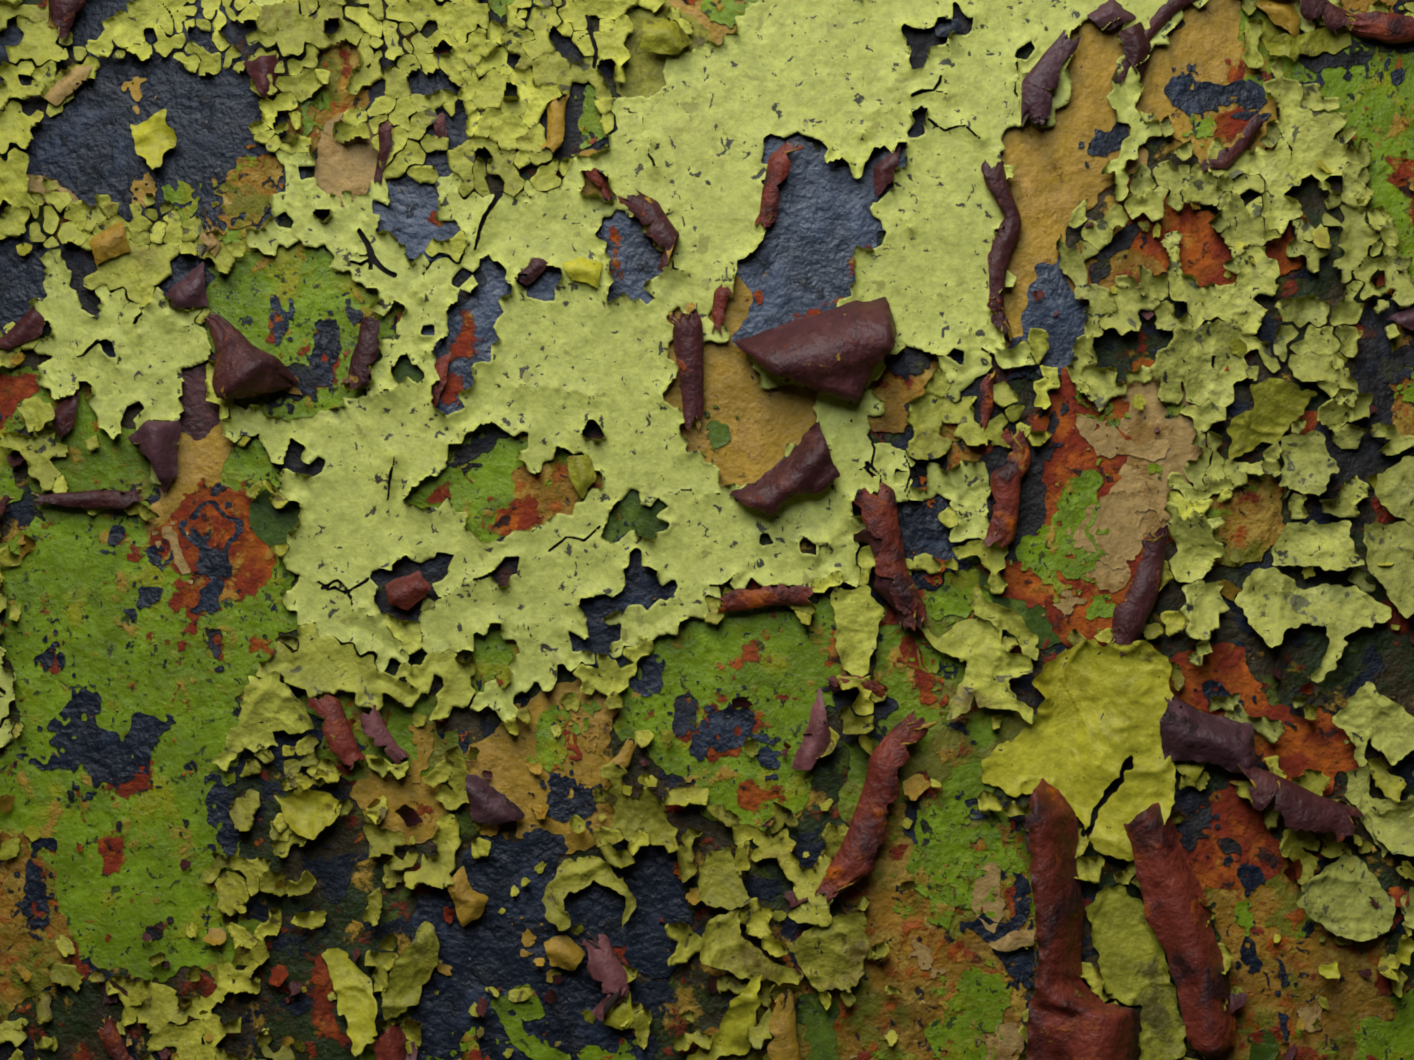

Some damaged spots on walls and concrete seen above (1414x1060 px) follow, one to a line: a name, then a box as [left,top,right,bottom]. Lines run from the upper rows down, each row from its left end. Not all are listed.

crack [474,190,505,251]
crack [349,228,397,278]
peeling [561,692,580,712]
peeling [240,758,261,777]
peeling [525,762,542,774]
peeling [903,774,941,801]
crack [1080,755,1133,837]
peeling [531,801,549,819]
peeling [685,887,700,905]
peeling [563,880,627,947]
peeling [55,935,75,957]
peeling [885,1030,898,1046]